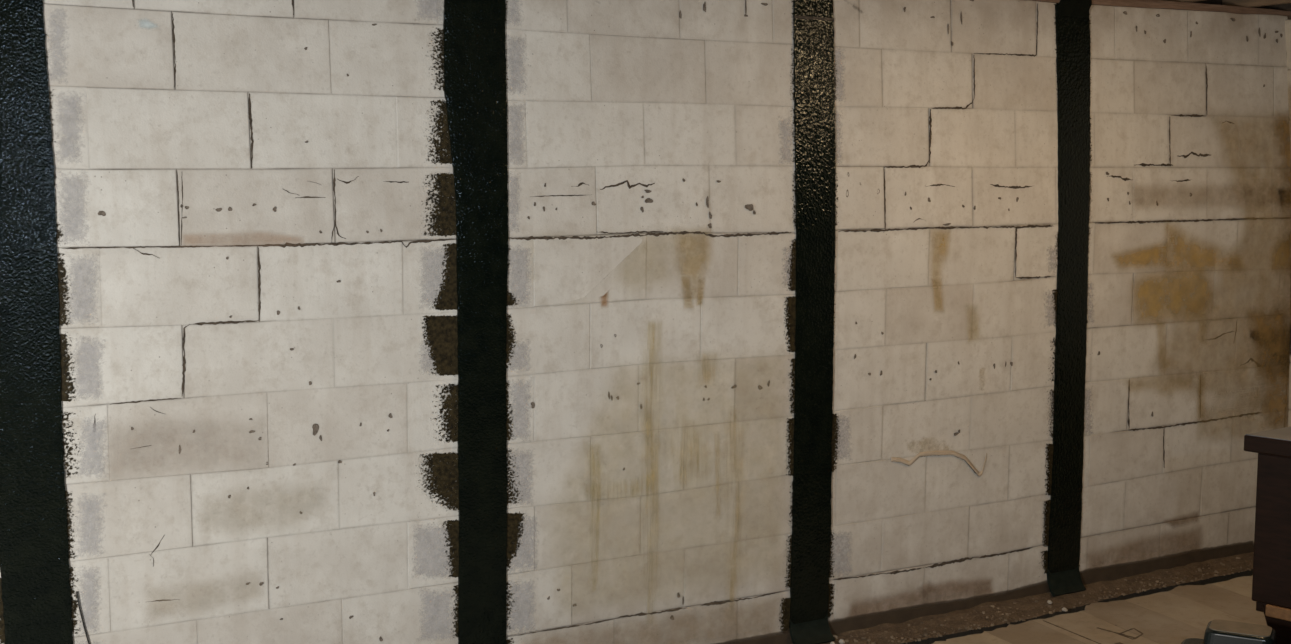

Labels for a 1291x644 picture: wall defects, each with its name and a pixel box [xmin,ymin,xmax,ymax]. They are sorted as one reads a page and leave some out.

crack [533,180,655,197]
crack [510,231,791,241]
crack [838,4,1053,279]
crack [1107,68,1234,182]